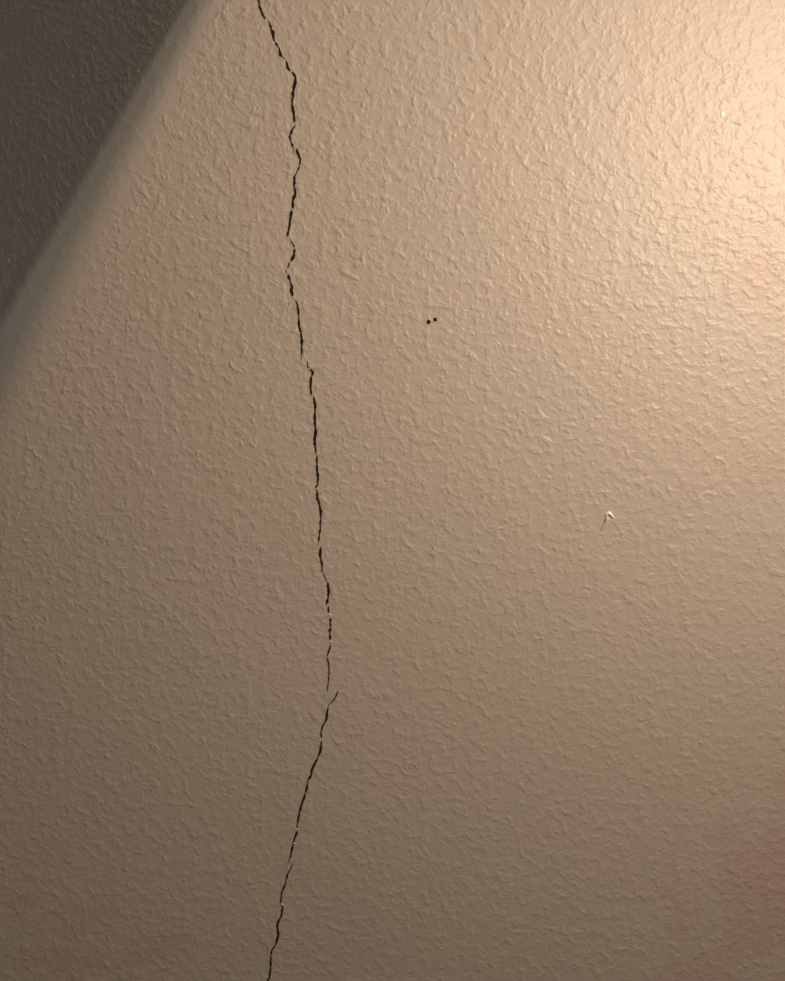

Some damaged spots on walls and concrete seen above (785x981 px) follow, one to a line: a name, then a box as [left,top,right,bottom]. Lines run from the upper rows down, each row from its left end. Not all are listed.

crack [258,0,338,981]